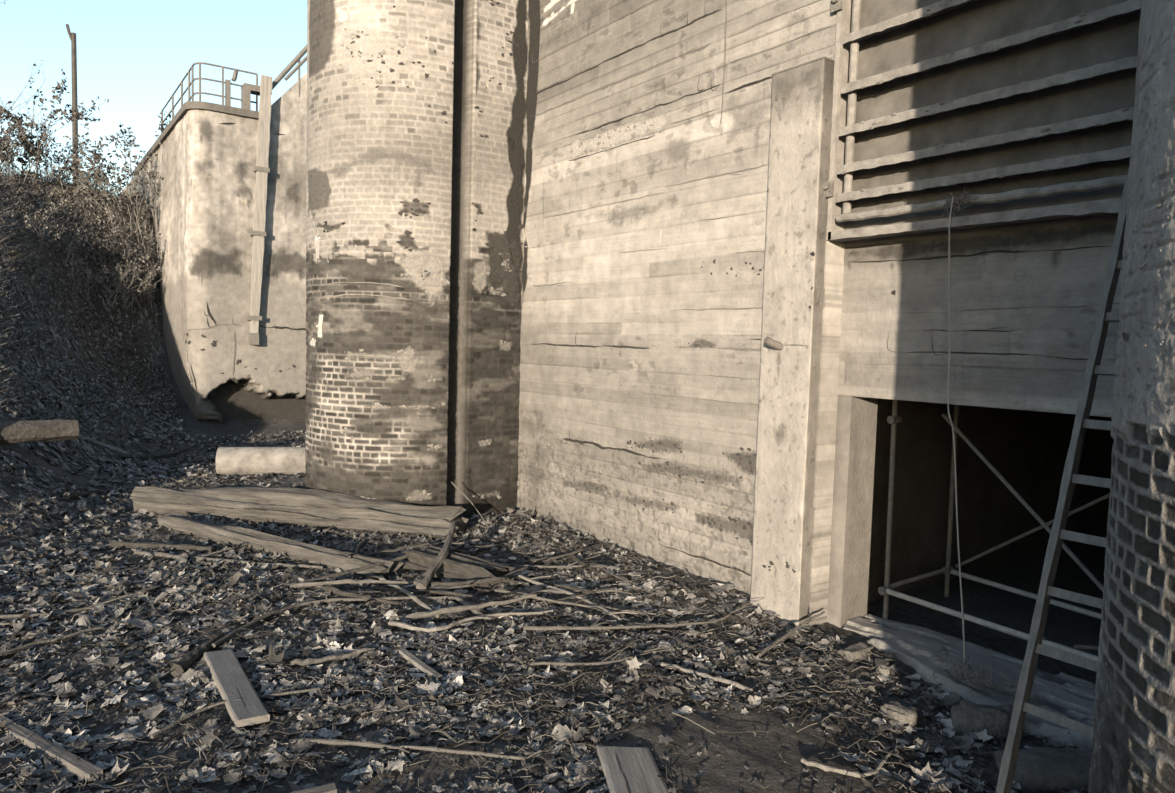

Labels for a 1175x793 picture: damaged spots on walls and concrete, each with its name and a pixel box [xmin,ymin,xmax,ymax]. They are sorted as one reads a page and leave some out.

spalling [314,221,345,259]
peeling [396,198,445,305]
peeling [310,314,323,347]
crack [533,329,648,349]
crack [640,292,762,406]
crack [562,434,658,459]